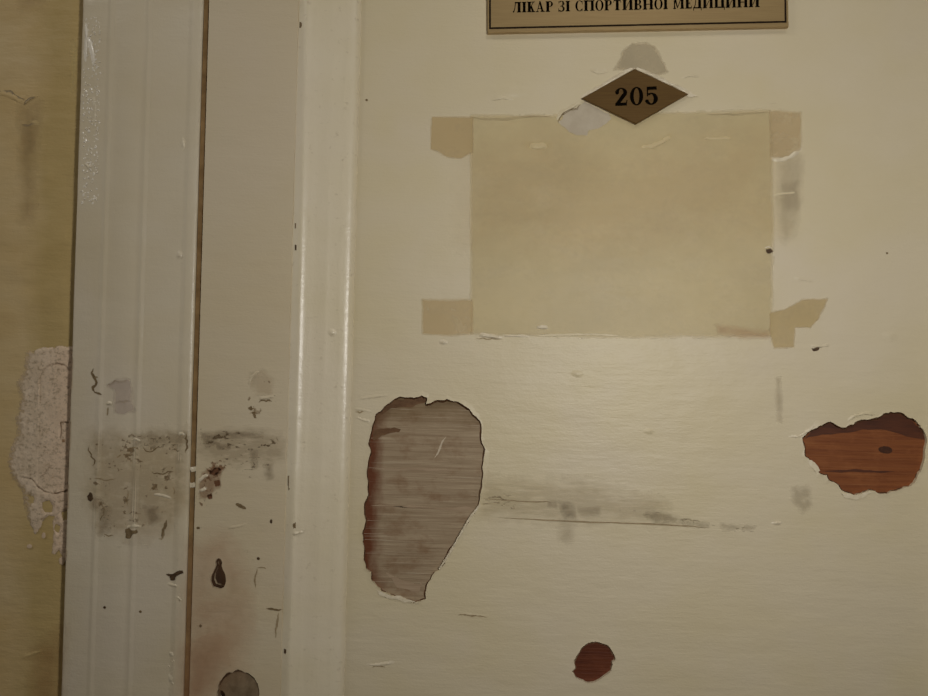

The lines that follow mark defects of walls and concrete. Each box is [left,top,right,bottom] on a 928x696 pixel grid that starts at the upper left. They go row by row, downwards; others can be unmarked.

peeling [555,45,701,136]
spalling [9,346,73,565]
peeling [353,390,490,605]
peeling [789,409,928,500]
peeling [570,638,619,685]